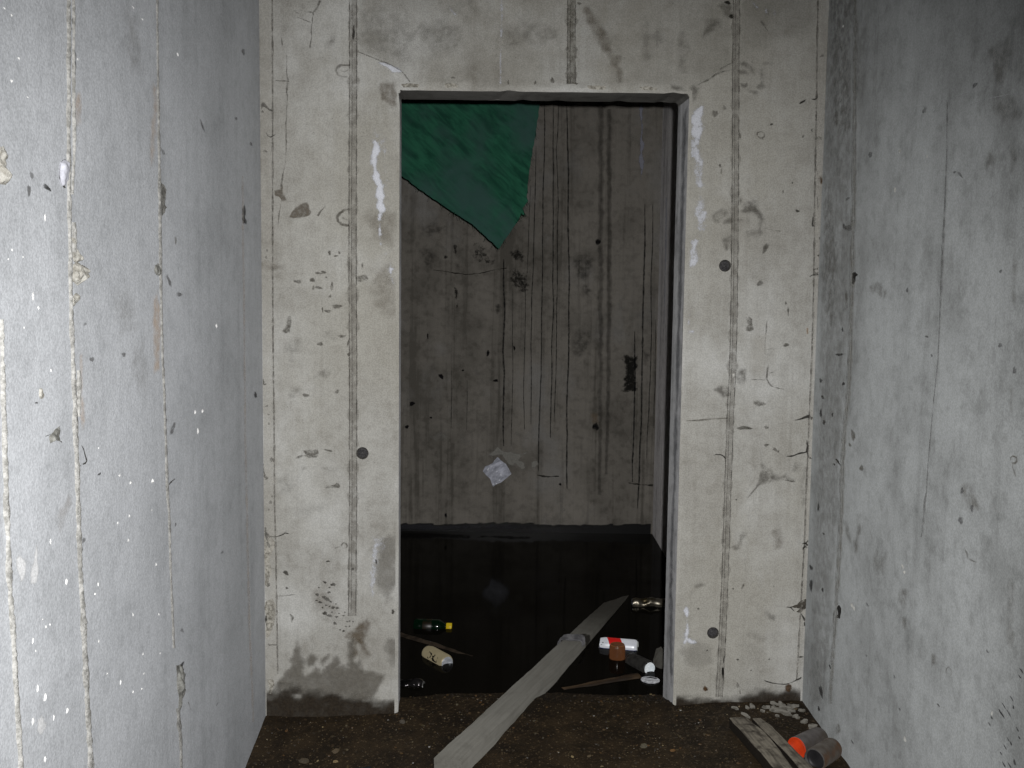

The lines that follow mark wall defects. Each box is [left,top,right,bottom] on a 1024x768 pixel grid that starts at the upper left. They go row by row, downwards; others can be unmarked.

spalling [0,146,13,185]
water stain [370,140,385,245]
spalling [72,237,91,306]
water stain [676,106,706,391]
water stain [278,624,382,700]